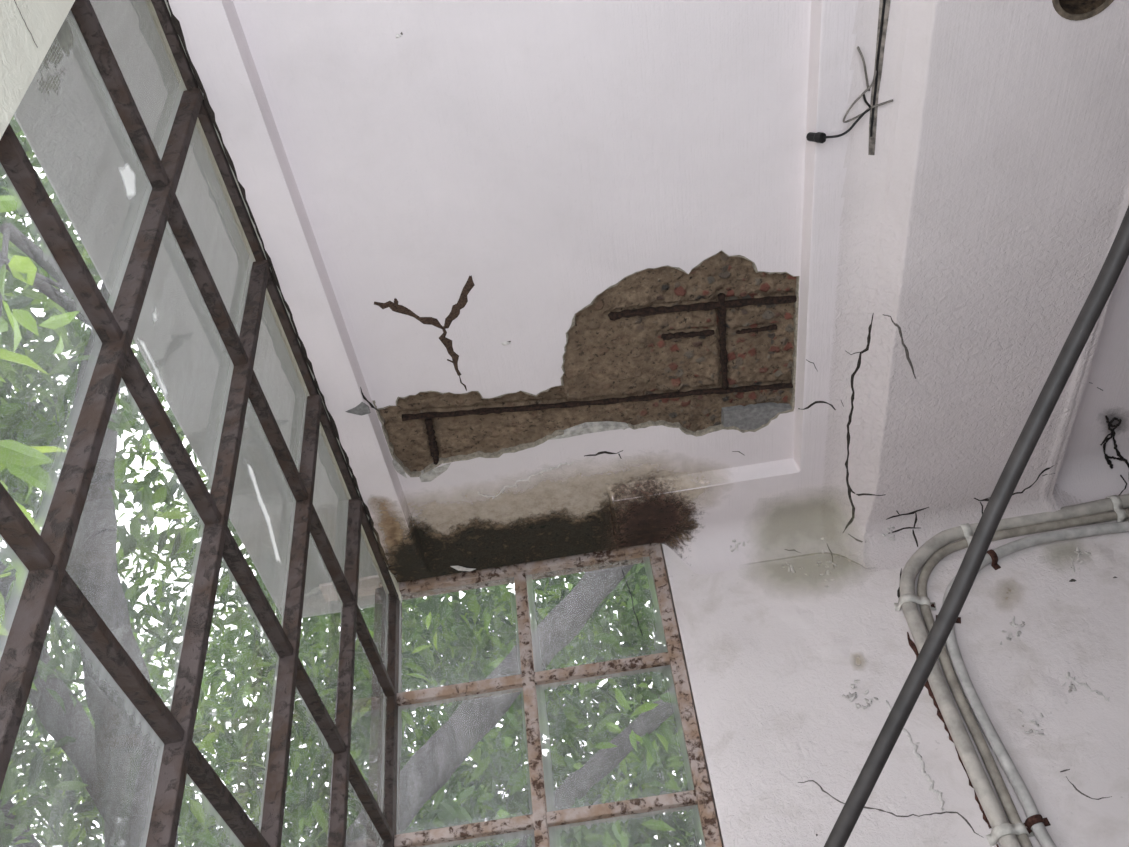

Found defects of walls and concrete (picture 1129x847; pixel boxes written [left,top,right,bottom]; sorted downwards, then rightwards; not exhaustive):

crack [374,275,474,391]
water stain [383,467,705,583]
spalling [345,250,800,482]
crack [798,313,929,598]
crack [974,465,1055,514]
crack [798,632,999,847]